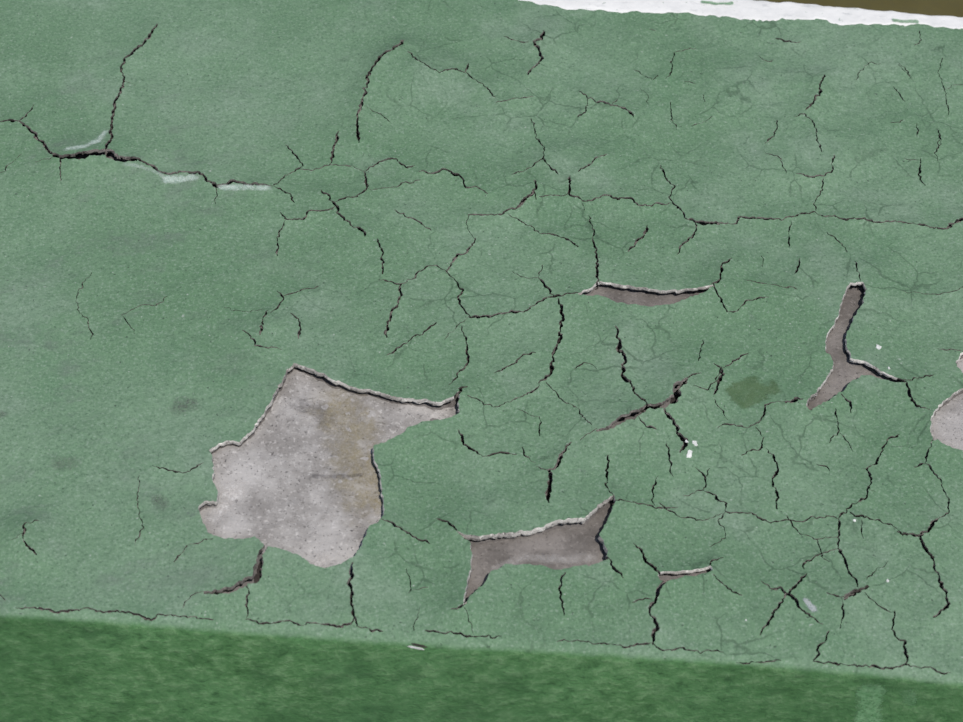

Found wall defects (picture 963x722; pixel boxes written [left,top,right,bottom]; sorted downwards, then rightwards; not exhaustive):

crack [0,24,488,256]
crack [355,40,533,143]
crack [504,30,545,75]
crack [577,48,712,130]
crack [228,286,318,350]
peeling [198,363,460,570]
peeling [578,281,713,307]
crack [377,62,963,674]
peeling [806,282,897,410]
peeling [930,388,963,450]
crack [0,546,383,632]
peeling [457,496,616,612]